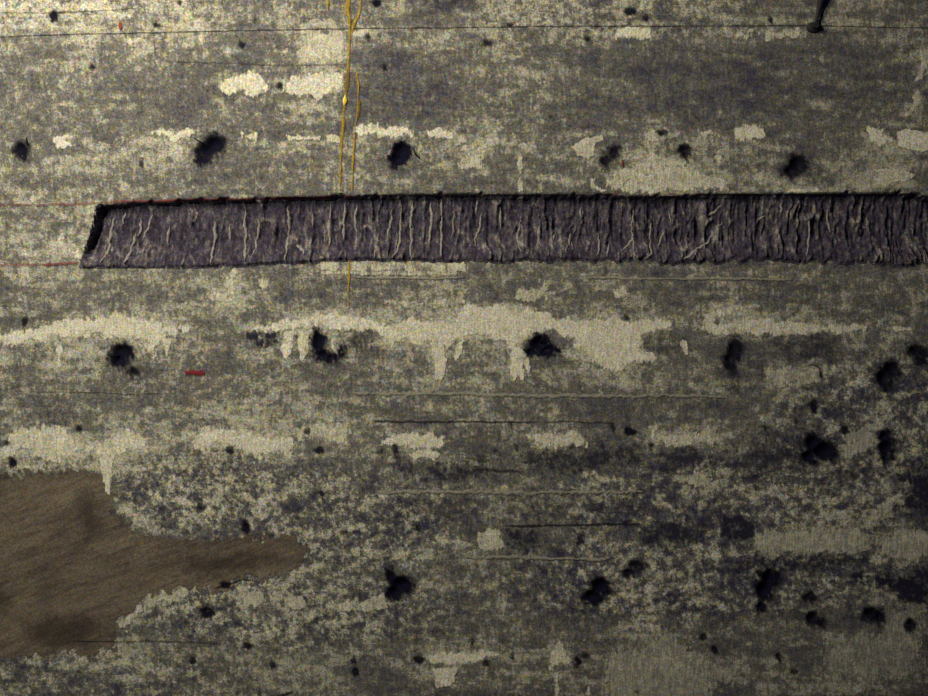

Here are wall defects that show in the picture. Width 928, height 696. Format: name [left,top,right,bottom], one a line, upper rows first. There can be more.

rust [339,0,361,191]
peeling [320,261,466,276]
damp [246,329,279,347]
crack [371,419,612,427]
crack [504,519,641,527]